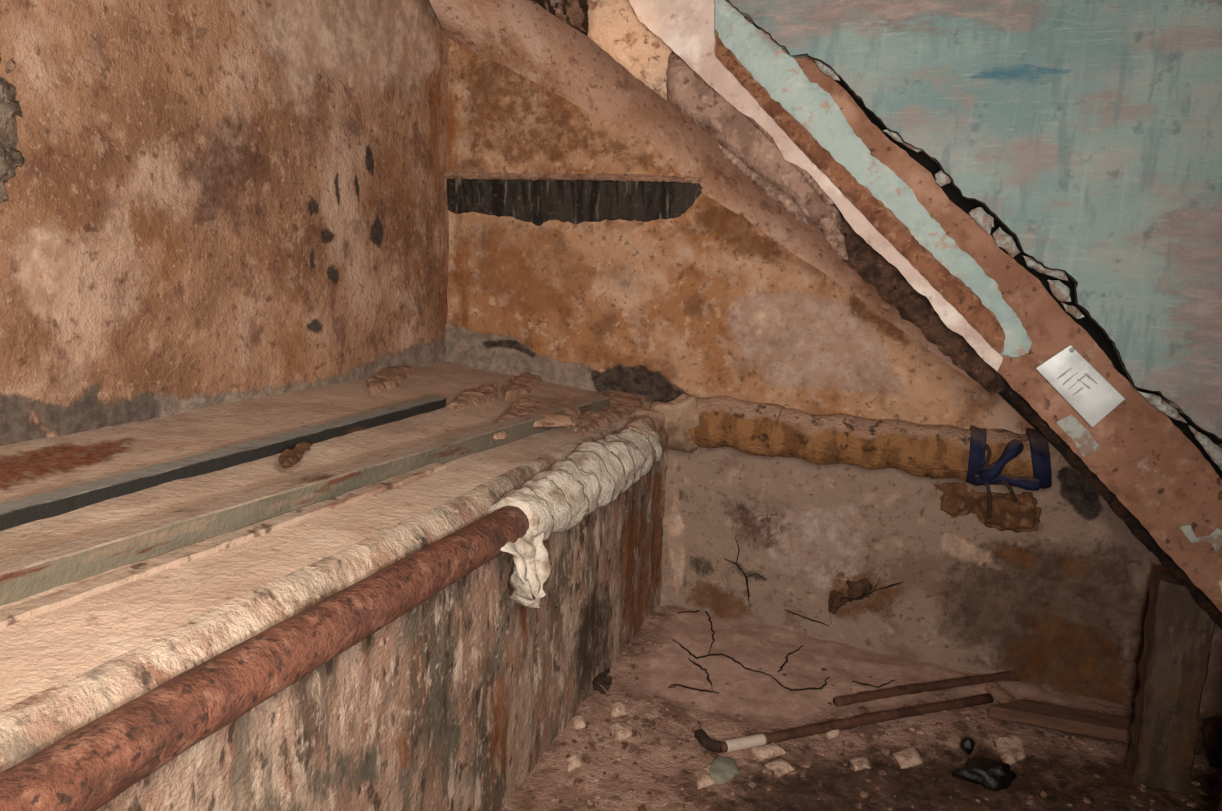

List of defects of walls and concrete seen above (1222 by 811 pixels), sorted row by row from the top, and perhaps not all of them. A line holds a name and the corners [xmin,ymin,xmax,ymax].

flaking render [0,53,25,204]
flaking render [807,55,1222,470]
crack [724,538,767,611]
flaking render [828,578,873,614]
flaking render [932,482,1042,533]
peeling [1180,525,1222,552]
crack [672,579,903,694]
damp [309,749,378,799]